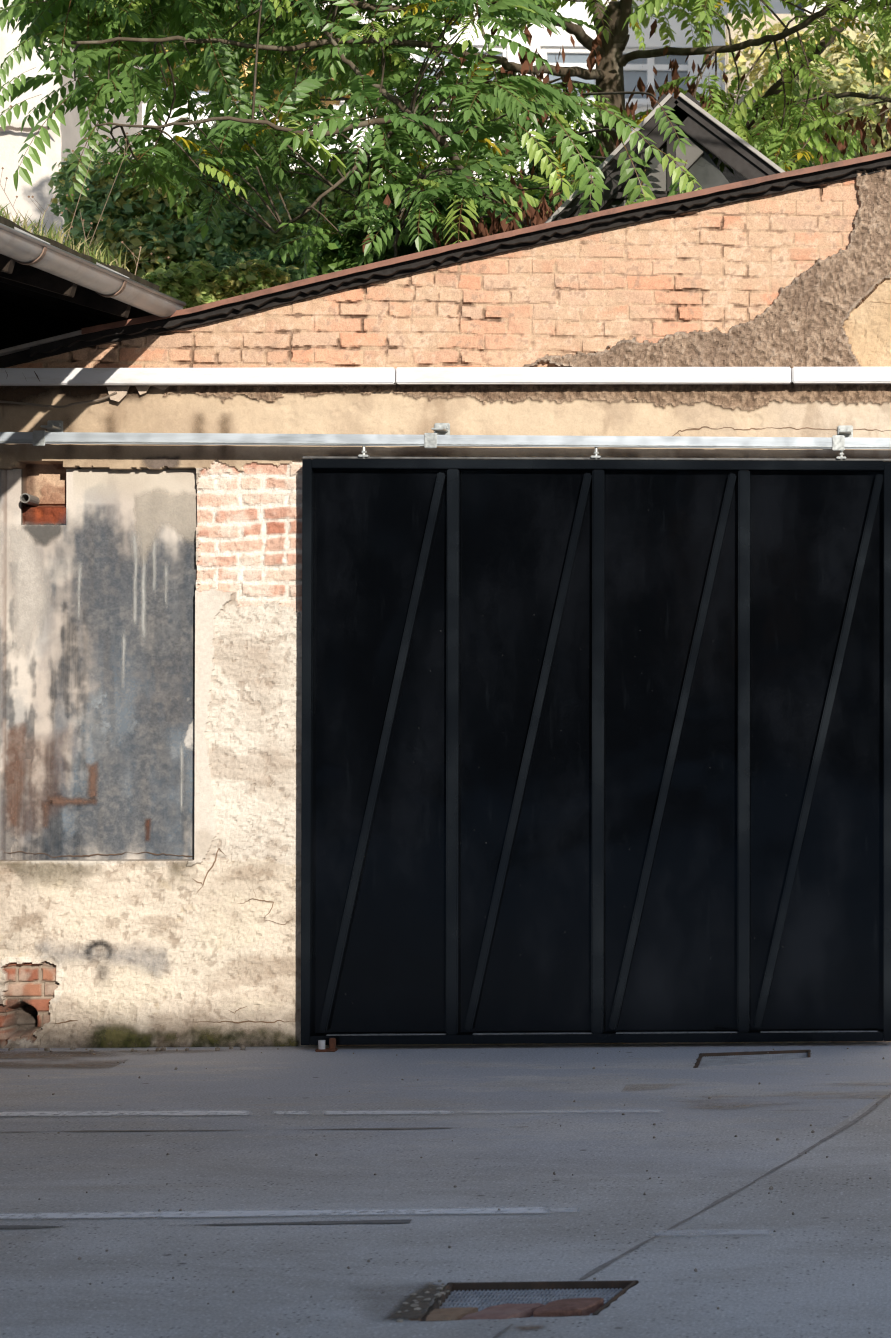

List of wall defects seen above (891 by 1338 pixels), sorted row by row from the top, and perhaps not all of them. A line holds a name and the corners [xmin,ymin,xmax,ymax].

flaking render [6,170,861,369]
peeling [107,386,168,402]
flaking render [197,459,302,616]
water stain [3,491,197,860]
rust [7,729,24,824]
rust [43,764,97,825]
spalling [0,961,59,1048]